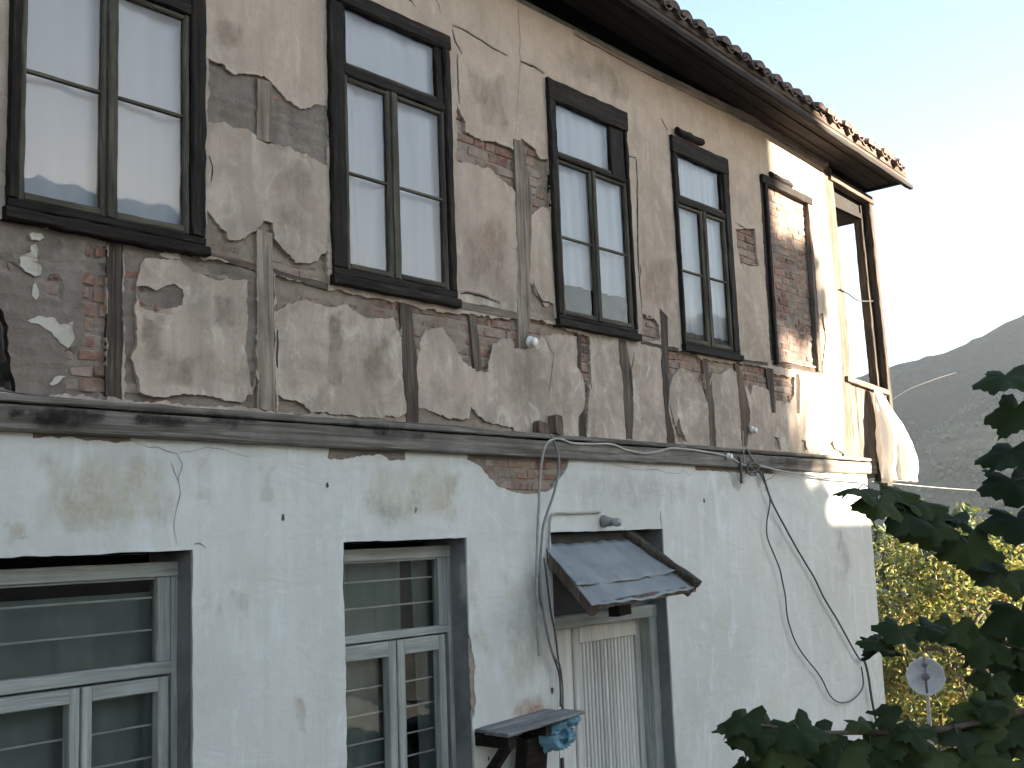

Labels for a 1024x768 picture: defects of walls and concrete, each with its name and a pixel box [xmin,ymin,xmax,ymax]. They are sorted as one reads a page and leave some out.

spalling [207,62,328,165]
crack [409,0,545,132]
spalling [455,111,548,214]
spalling [736,229,757,265]
spalling [0,221,107,400]
spalling [122,213,590,431]
spalling [668,351,792,402]
crack [135,442,249,548]
spalling [328,449,405,461]
spalling [467,455,567,494]